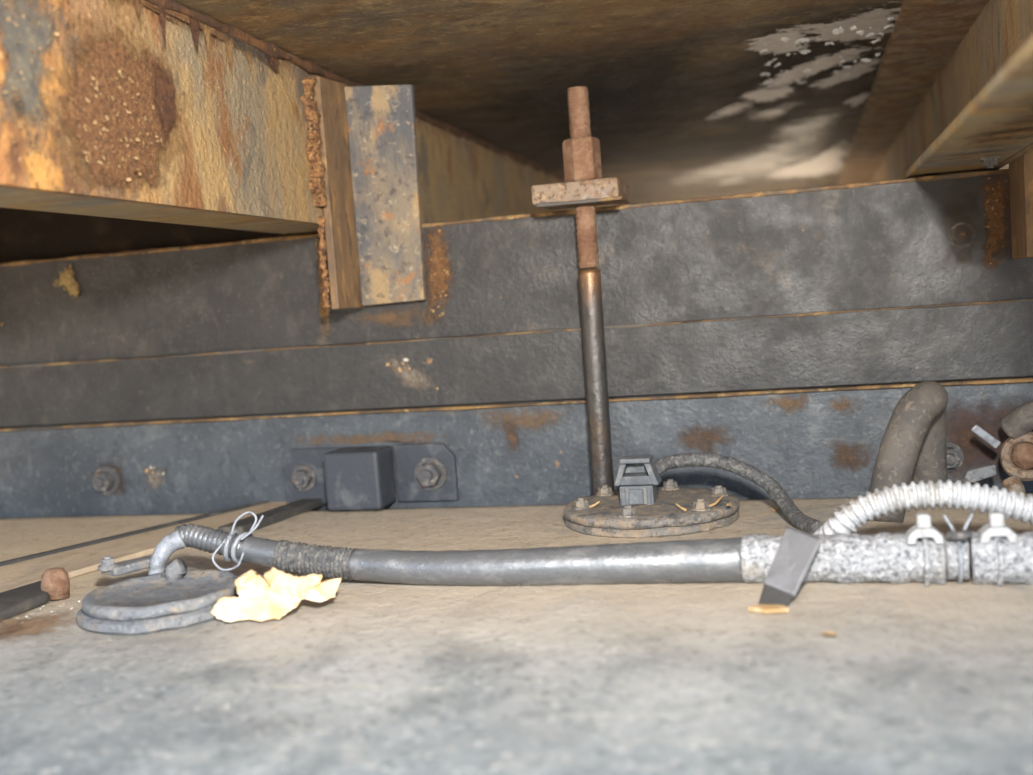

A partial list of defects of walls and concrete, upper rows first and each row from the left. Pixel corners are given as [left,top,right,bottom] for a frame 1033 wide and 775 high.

corrosion [55,0,279,194]
peeling [680,1,903,184]
peeling [53,265,81,299]
corrosion [0,77,331,328]
corrosion [0,328,582,368]
peeling [386,358,425,385]
corrosion [422,169,1010,320]
corrosion [604,298,1033,329]